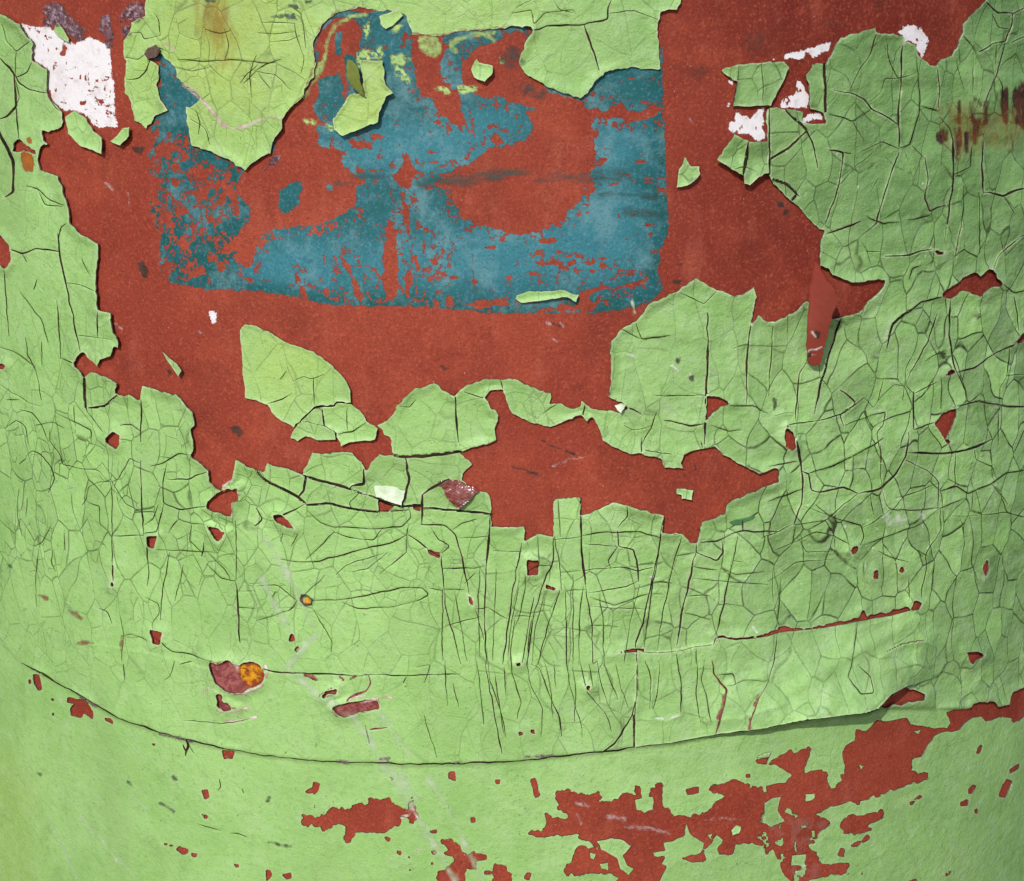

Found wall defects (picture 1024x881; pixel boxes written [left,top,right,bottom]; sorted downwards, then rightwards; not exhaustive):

crack [0,26,63,207]
crack [736,2,1024,279]
corrosion [936,101,988,154]
corrosion [1001,83,1024,129]
peeling [0,0,984,543]
peeling [942,269,1001,299]
crack [1,224,1024,765]
corrosion [209,661,264,711]
peeling [323,689,379,716]
peeling [528,687,1024,881]
peeling [302,797,419,870]
peeling [430,829,531,881]